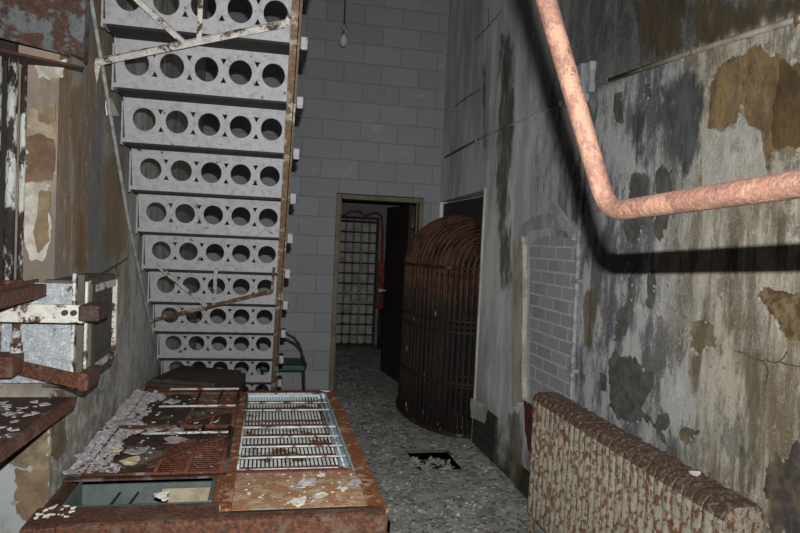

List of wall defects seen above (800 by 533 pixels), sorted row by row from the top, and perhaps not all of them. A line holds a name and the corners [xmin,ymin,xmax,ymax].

flaking render [24,103,57,261]
flaking render [35,59,67,80]
leakage [496,35,514,287]
leakage [632,114,648,166]
leakage [654,72,703,174]
flaking render [701,42,800,186]
peeling [598,270,701,445]
spalling [687,319,717,356]
crack [737,351,800,385]
spalling [756,287,800,341]
spalling [763,440,800,533]